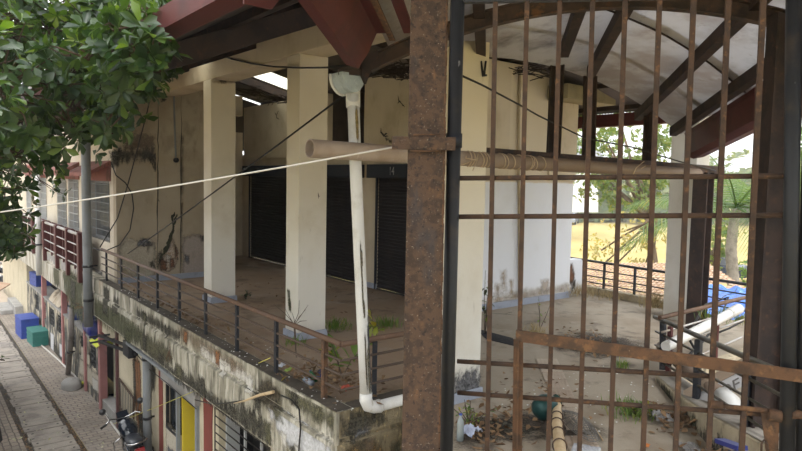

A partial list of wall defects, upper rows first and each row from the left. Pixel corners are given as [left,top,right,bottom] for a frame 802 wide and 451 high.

water stain [110,133,156,171]
water stain [102,287,120,316]
water stain [124,307,386,451]
water stain [360,243,371,392]